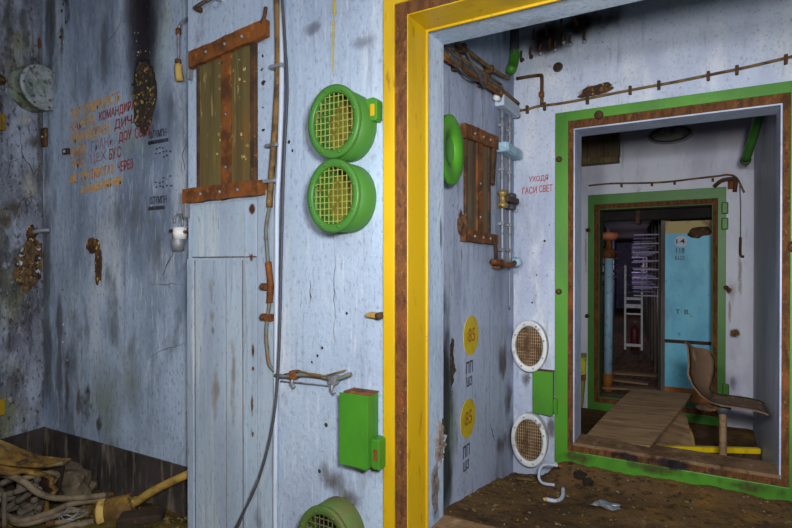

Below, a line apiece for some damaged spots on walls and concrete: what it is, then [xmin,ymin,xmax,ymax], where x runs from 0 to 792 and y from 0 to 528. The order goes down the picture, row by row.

water stain [46,0,63,69]
rust [94,246,102,285]
water stain [43,303,89,418]
water stain [443,332,452,511]